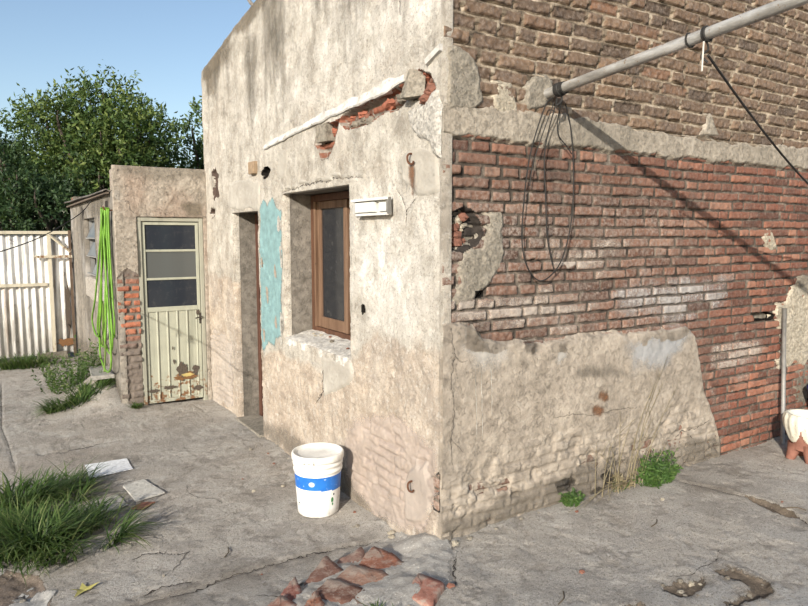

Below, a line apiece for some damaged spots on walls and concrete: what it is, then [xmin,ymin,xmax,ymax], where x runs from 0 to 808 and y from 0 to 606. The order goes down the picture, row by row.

water stain [203,0,264,92]
spalling [314,68,436,161]
spalling [209,168,219,218]
spalling [451,206,484,253]
crack [450,328,466,465]